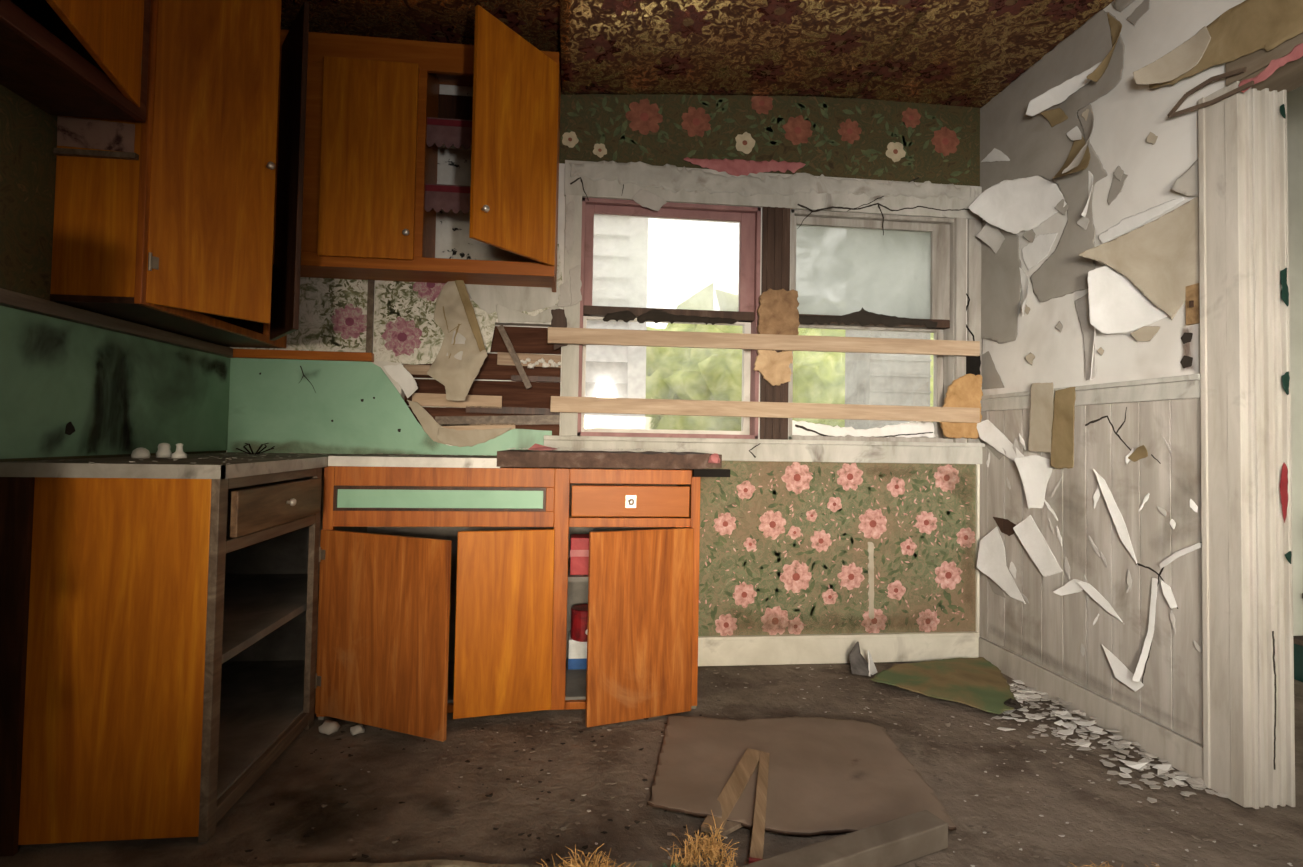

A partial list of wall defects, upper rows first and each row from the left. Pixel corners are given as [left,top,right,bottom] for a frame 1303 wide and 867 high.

peeling [1238,43,1303,93]
peeling [569,0,1185,316]
crack [797,177,970,235]
peeling [1280,268,1289,307]
flaking render [383,201,582,447]
peeling [1282,371,1290,395]
peeling [966,266,1168,625]
peeling [1139,493,1176,529]
peeling [1280,463,1288,523]
peeling [1101,543,1201,692]